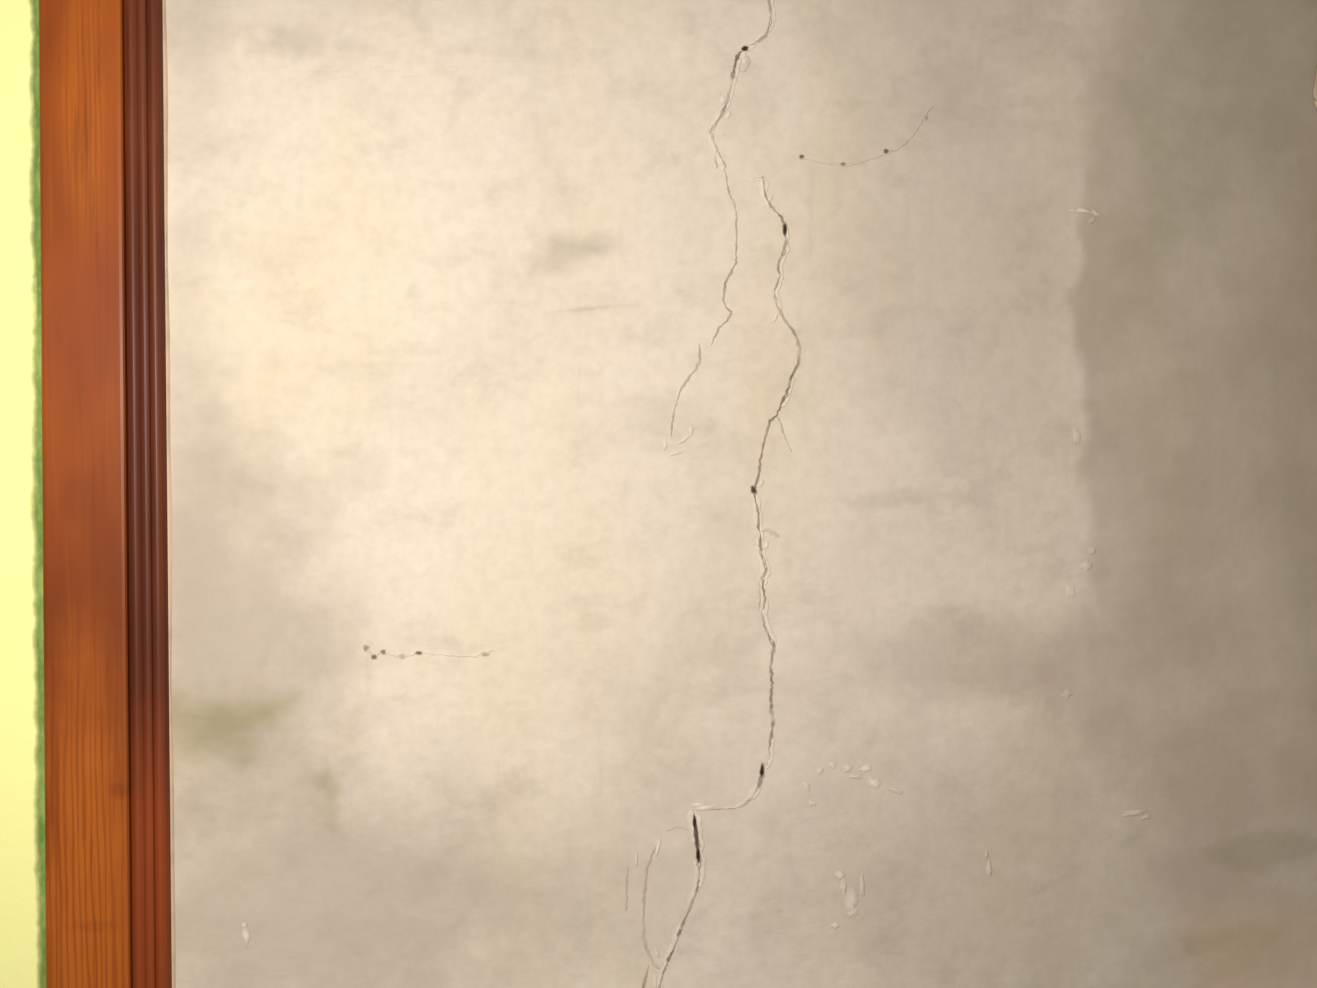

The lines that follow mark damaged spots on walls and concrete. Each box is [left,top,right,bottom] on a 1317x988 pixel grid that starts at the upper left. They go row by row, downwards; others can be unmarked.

crack [798,109,931,167]
crack [624,0,801,988]
leakage [172,656,327,790]
leakage [304,757,352,842]